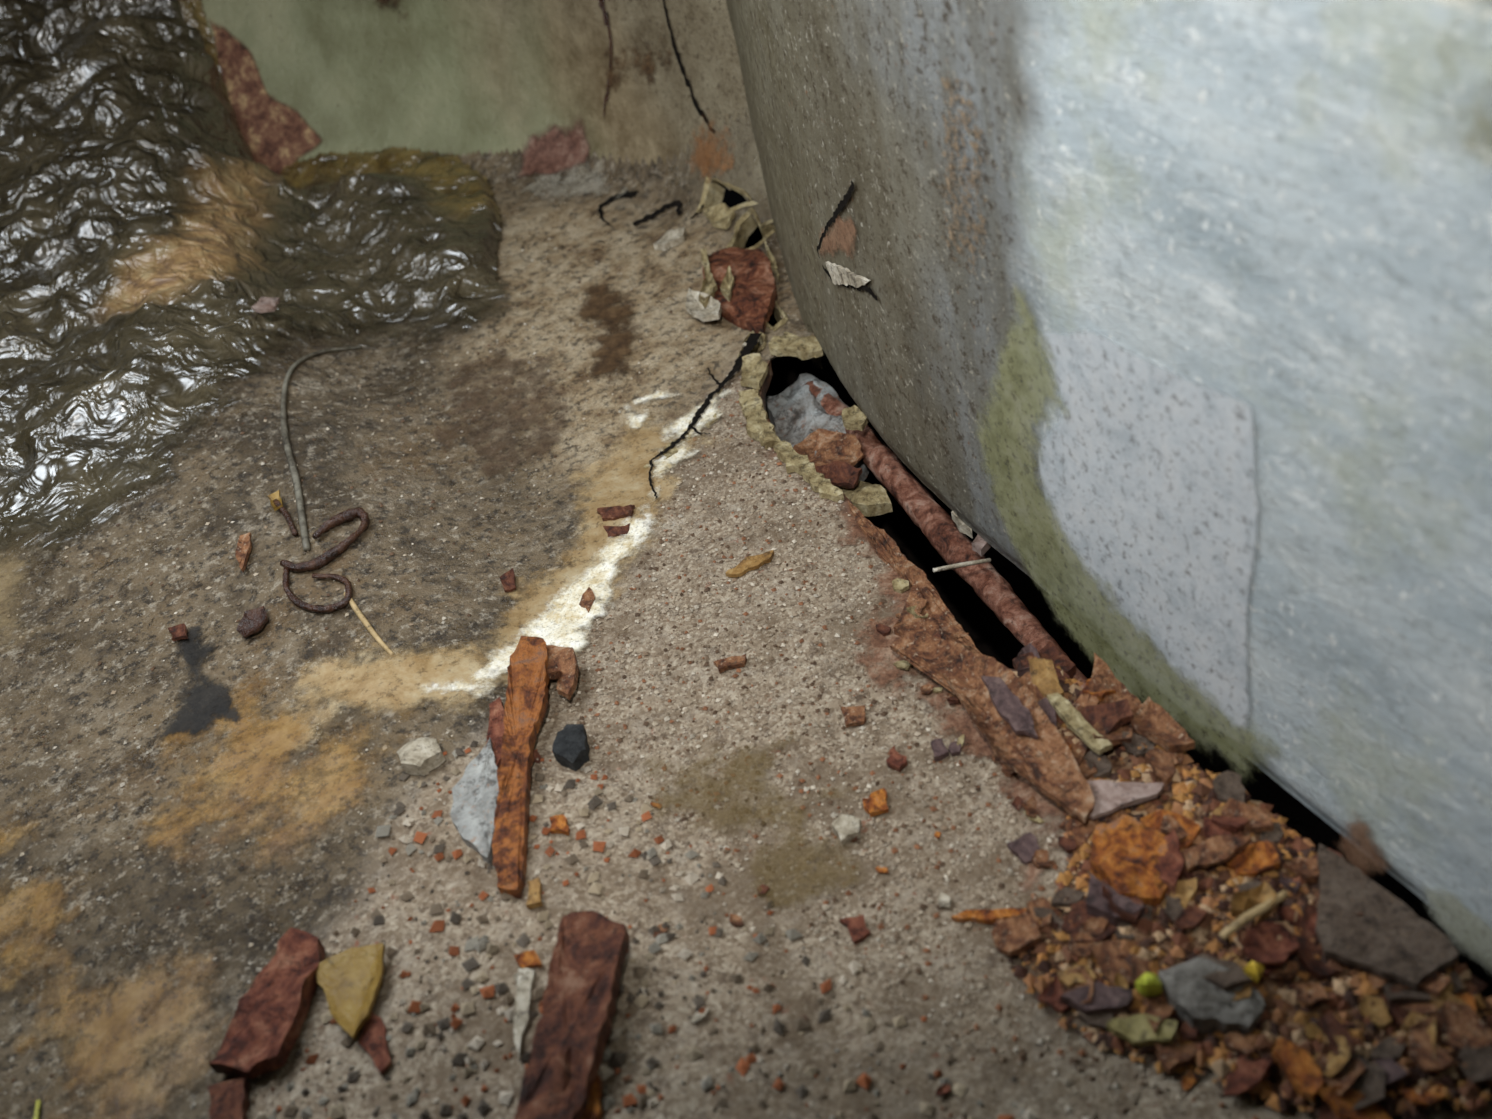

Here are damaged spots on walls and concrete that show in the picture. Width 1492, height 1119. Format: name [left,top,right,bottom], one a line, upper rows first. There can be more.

crack [599,0,612,115]
crack [663,0,715,134]
crack [817,181,877,300]
spalling [653,176,844,503]
crack [643,332,762,499]
corrosion [815,460,862,489]
spalling [842,405,868,431]
leakage [146,390,730,858]
corrosion [486,636,579,899]
corrosion [839,517,1492,1119]
corrosion [513,950,543,969]